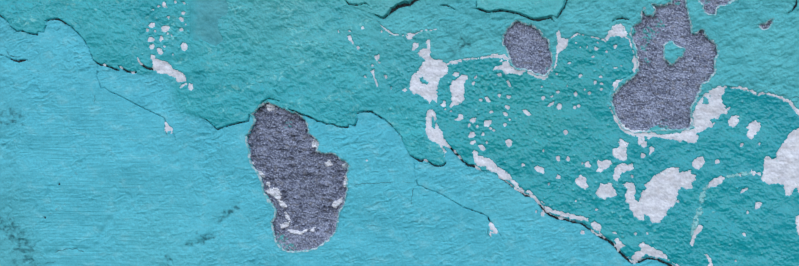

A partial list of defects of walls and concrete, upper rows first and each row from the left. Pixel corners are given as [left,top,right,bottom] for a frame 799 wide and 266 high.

crack [346,0,418,19]
crack [479,0,568,21]
crack [0,15,153,73]
peeling [120,1,193,91]
spalling [377,0,799,252]
spalling [245,101,349,253]
peeling [627,232,679,266]